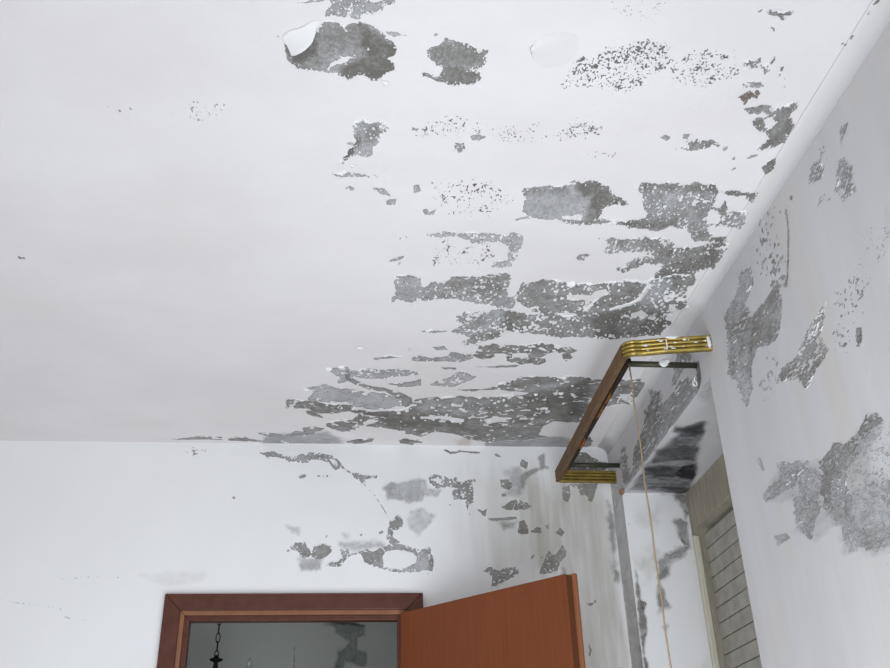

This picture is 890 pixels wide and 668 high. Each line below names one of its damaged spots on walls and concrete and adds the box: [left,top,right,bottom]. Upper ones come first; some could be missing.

peeling [282,0,400,86]
peeling [422,33,488,86]
peeling [333,115,396,205]
peeling [660,134,736,171]
peeling [738,57,799,174]
peeling [286,180,758,443]
peeling [724,206,871,407]
peeling [763,413,890,553]
peeling [287,515,435,573]